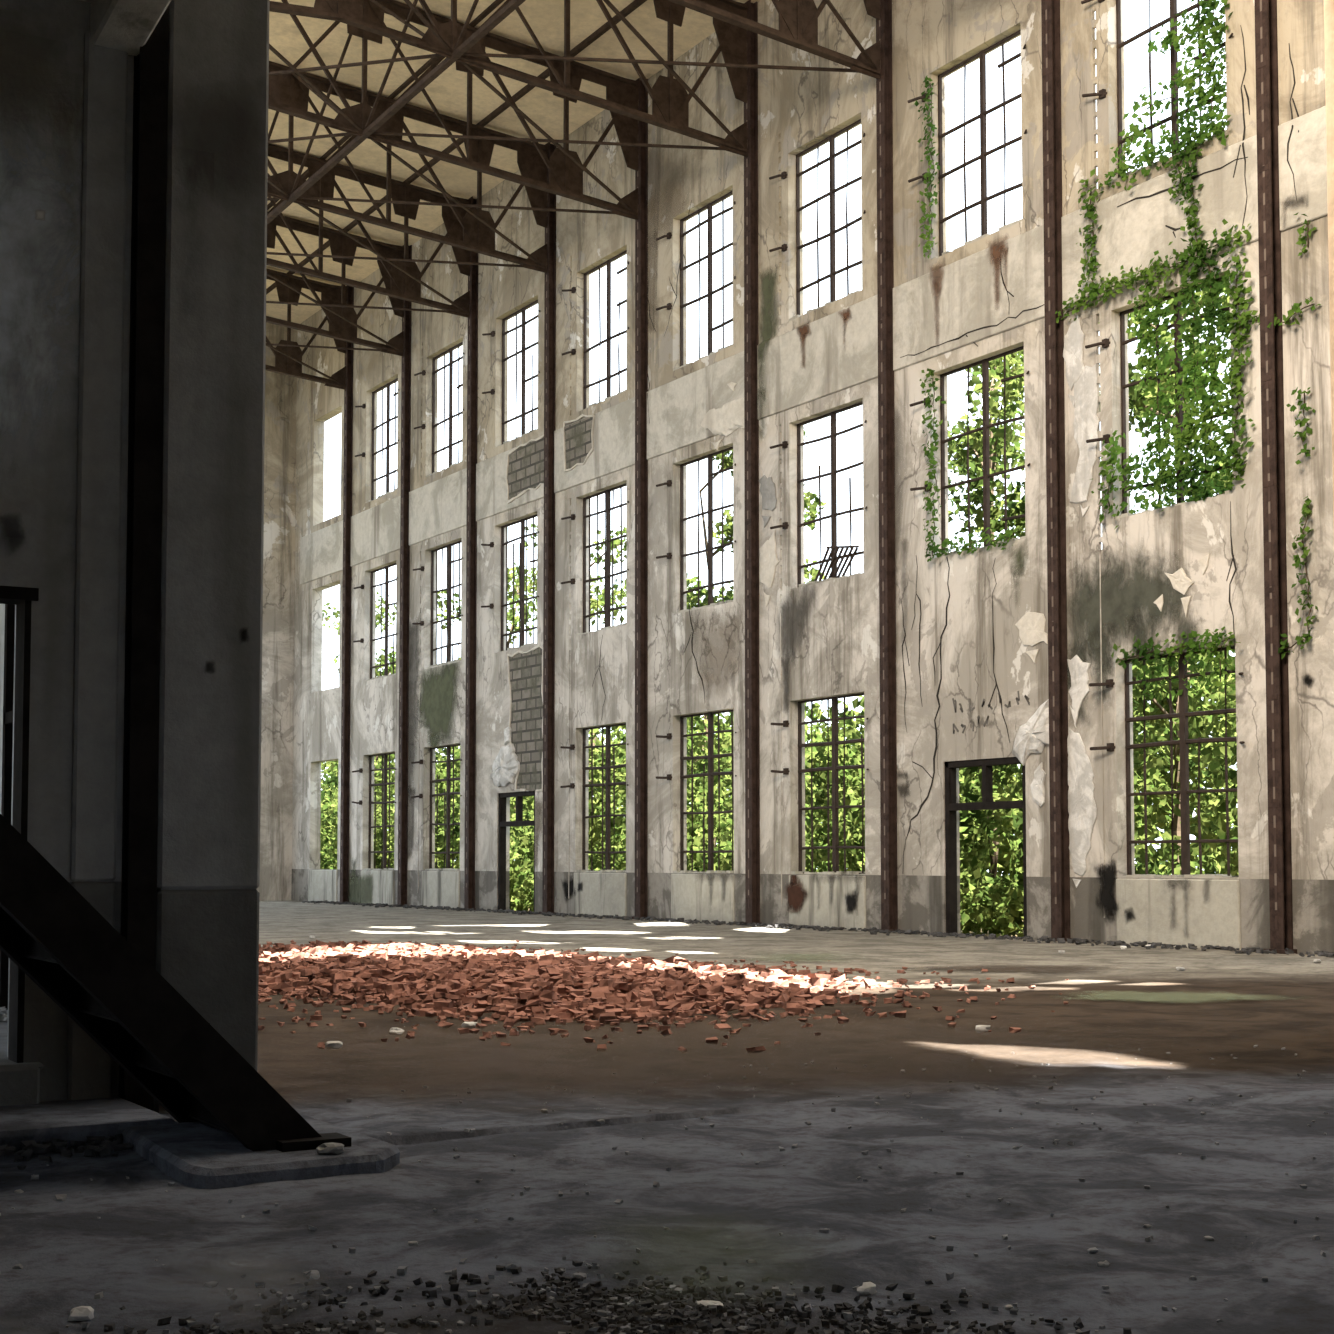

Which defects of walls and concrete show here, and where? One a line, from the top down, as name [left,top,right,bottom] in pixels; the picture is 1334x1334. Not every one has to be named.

rust [989,241,1007,301]
flaking render [506,434,544,504]
flaking render [563,414,595,472]
crack [989,560,1010,742]
peeling [1015,612,1048,663]
flaking render [507,645,543,792]
crack [901,556,950,865]
peeling [1012,699,1049,807]
peeling [1067,655,1134,921]